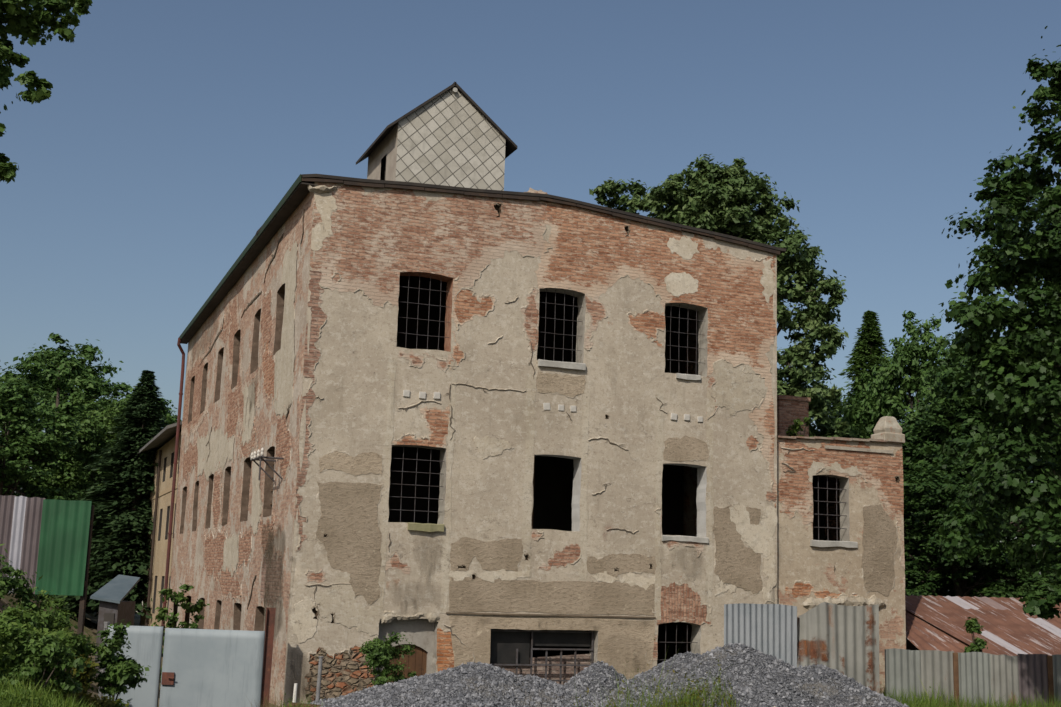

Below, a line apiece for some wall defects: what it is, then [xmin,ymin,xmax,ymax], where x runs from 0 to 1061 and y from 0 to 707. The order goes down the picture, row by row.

crack [400,343,535,440]
flaking render [181,182,905,703]
crack [588,437,628,450]
rust [797,640,827,663]
rust [865,620,874,690]